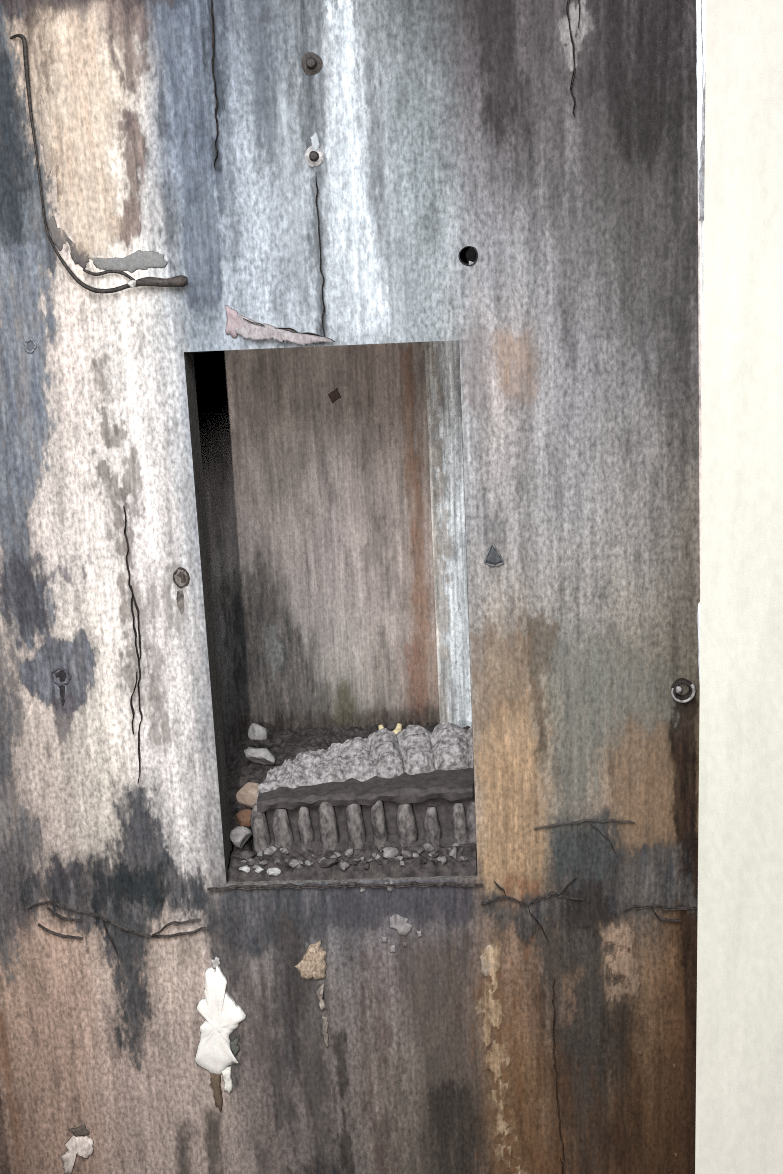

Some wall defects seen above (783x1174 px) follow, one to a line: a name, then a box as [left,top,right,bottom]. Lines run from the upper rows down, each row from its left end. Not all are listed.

spalling [38,10,168,273]
crack [211,0,219,170]
crack [566,0,580,117]
damp [559,0,589,71]
crack [123,506,143,783]
damp [0,0,473,1135]
crack [27,901,209,955]
flaking render [195,957,247,1113]
flaking render [295,940,329,1048]
damp [409,810,698,1174]
flaking render [61,1123,94,1174]
damp [204,1111,223,1174]